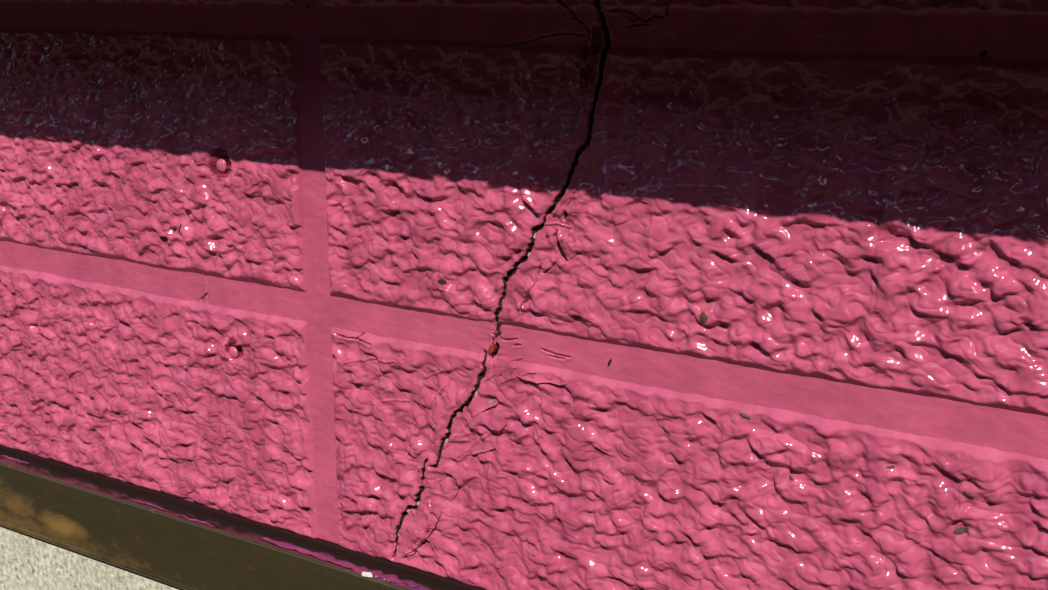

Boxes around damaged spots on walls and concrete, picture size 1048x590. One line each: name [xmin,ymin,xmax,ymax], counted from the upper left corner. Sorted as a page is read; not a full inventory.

crack [394,0,671,557]